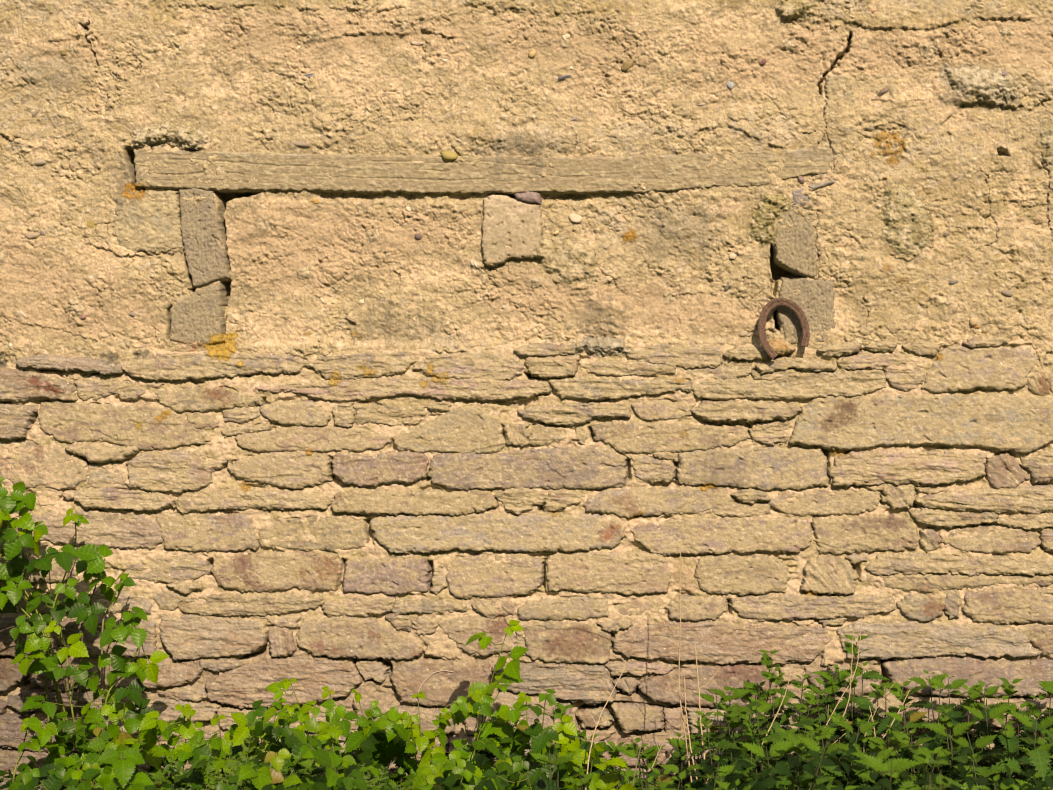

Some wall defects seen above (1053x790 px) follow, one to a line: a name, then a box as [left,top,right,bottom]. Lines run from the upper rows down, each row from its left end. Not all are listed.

crack [81,20,142,105]
crack [803,32,851,170]